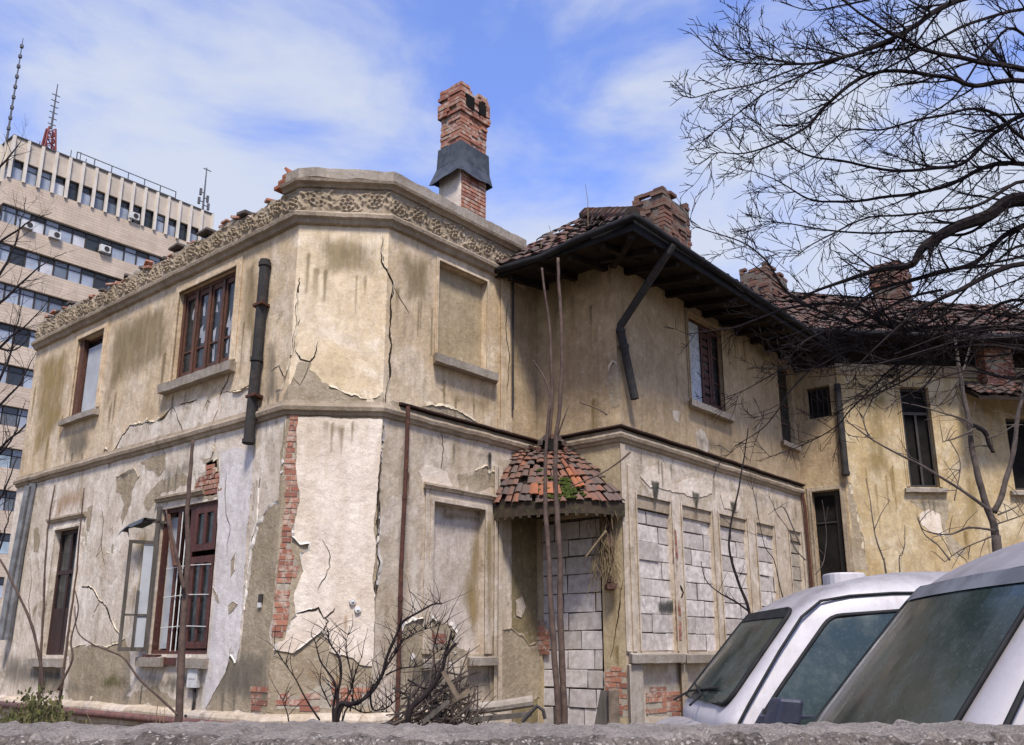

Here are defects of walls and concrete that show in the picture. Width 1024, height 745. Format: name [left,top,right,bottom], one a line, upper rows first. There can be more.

water stain [324,242,362,292]
water stain [32,357,86,461]
water stain [109,310,165,418]
crack [103,373,249,452]
crack [271,278,318,392]
flaking render [283,362,478,423]
crack [373,234,408,601]
crack [82,507,119,634]
peeling [116,415,383,714]
crack [296,539,335,629]
flaking render [488,596,550,701]
flaking render [646,684,681,716]